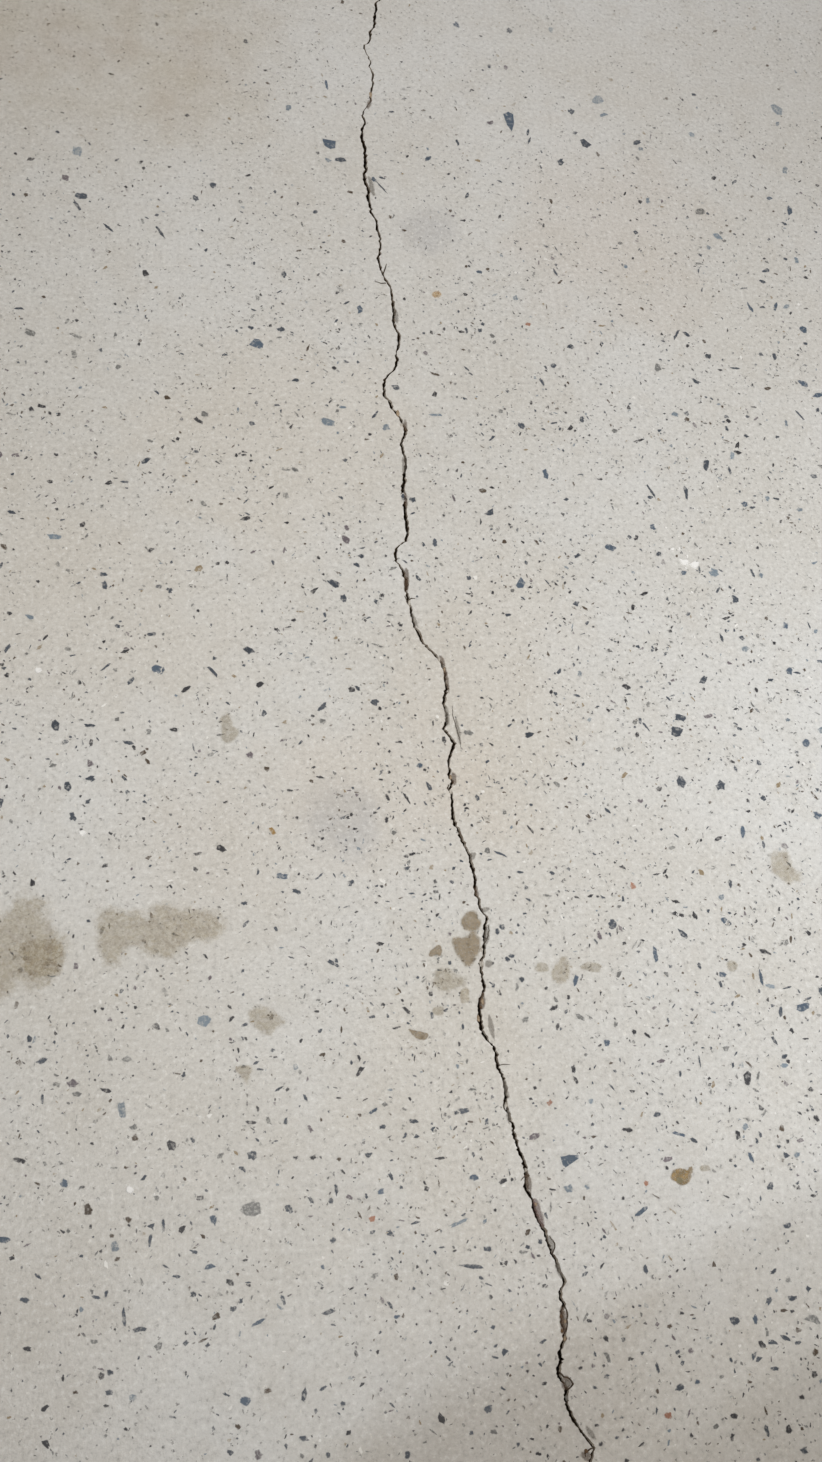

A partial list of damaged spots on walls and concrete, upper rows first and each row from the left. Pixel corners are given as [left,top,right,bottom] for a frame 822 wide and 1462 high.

crack [360,0,595,1462]